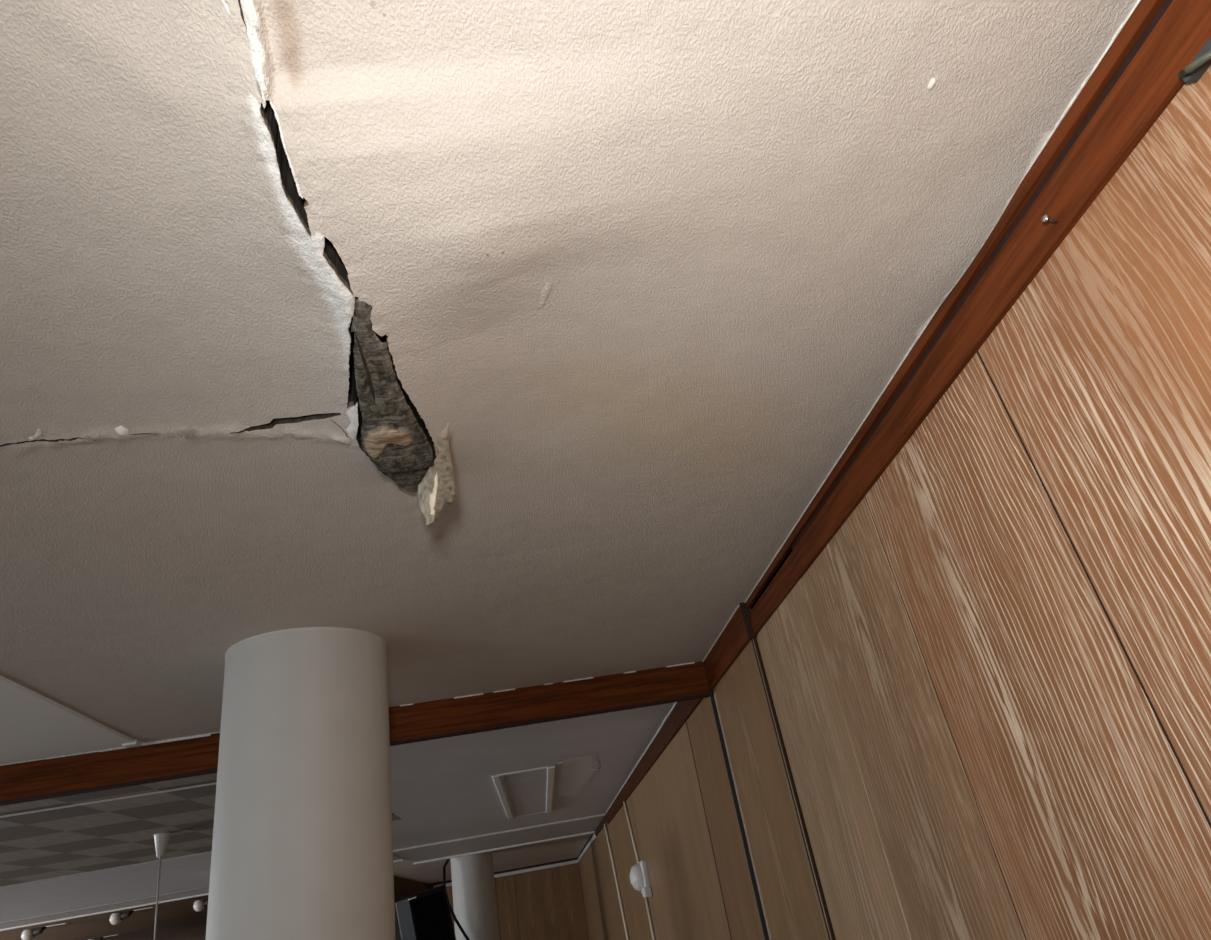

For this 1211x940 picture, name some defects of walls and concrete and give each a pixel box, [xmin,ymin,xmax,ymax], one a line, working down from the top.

crack [0,0,354,447]
spalling [346,297,456,525]